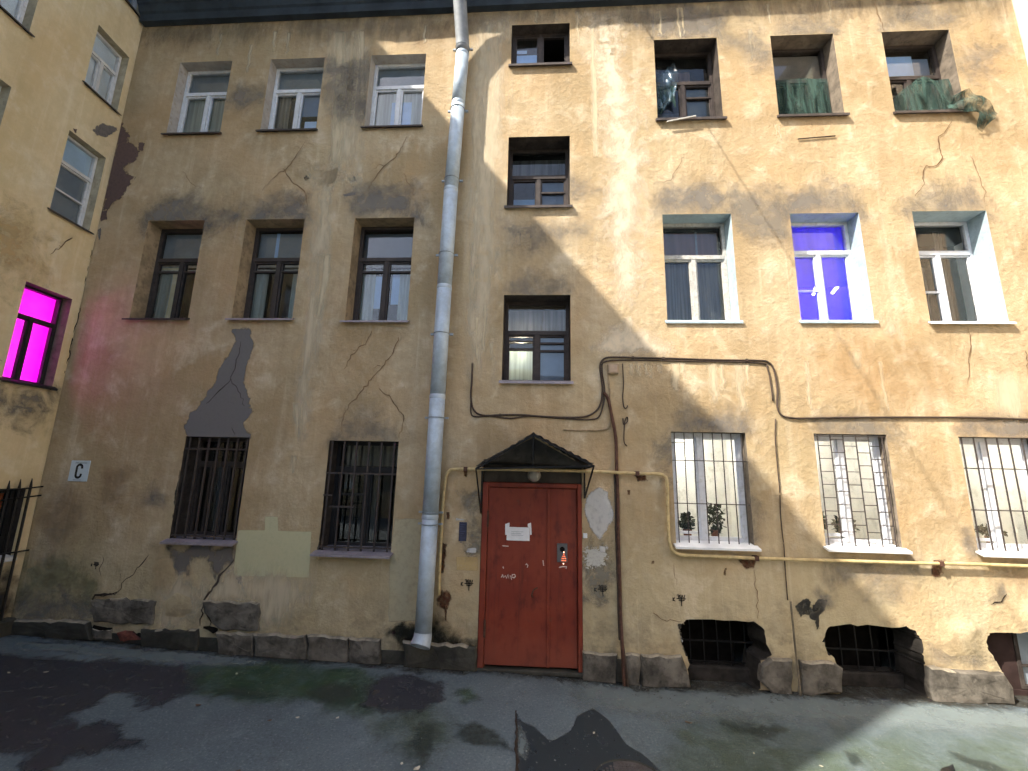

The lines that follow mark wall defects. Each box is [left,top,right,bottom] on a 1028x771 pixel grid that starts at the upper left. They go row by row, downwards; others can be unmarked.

flaking render [93,123,144,240]
crack [262,144,308,212]
crack [367,139,414,194]
crack [915,123,951,195]
crack [341,331,404,432]
crack [92,625,141,637]
crack [92,556,148,600]
crack [199,560,234,634]
damp [388,624,415,646]
damp [431,617,471,645]